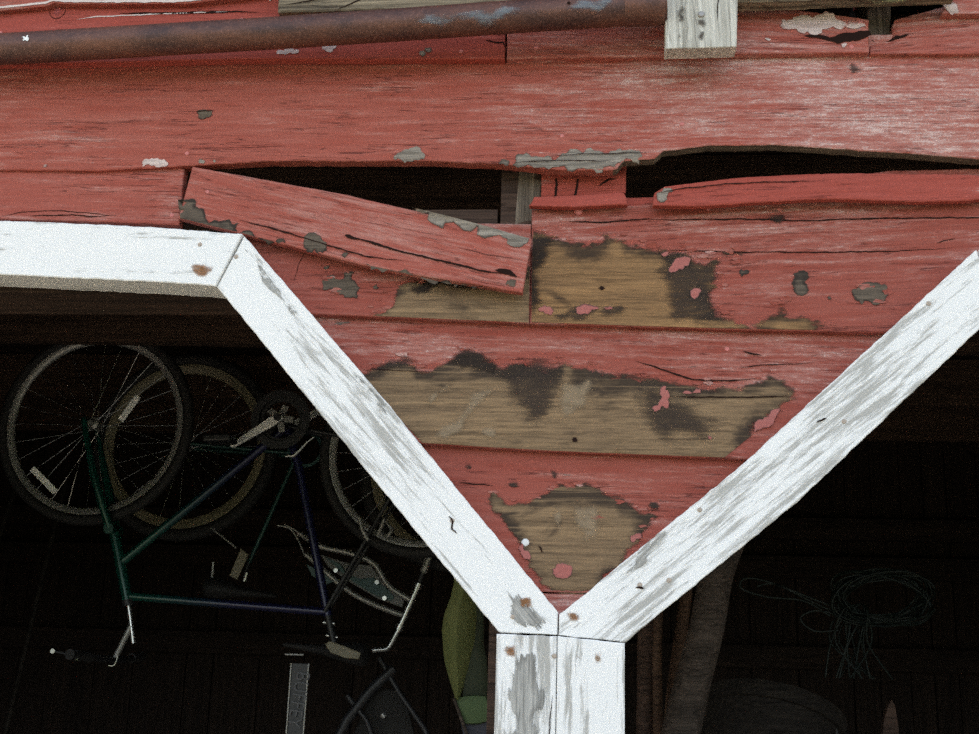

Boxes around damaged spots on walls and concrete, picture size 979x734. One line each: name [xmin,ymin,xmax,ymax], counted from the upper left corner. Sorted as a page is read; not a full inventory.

peeling [780,11,866,35]
peeling [178,198,285,245]
peeling [303,232,327,254]
peeling [322,266,360,298]
peeling [367,207,837,330]
peeling [851,282,894,305]
peeling [355,345,795,457]
peeling [488,471,691,594]
peeling [508,653,545,734]